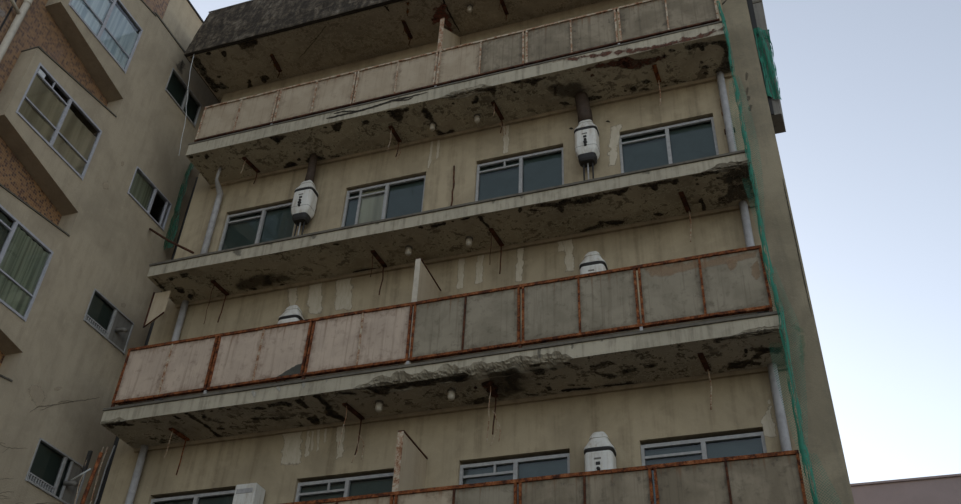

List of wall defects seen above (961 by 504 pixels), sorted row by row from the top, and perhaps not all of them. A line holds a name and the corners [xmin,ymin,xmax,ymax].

rust [554,27,725,77]
peeling [662,40,733,87]
spalling [384,107,409,121]
spalling [422,108,454,135]
spalling [713,325,783,370]
spalling [340,351,573,404]
spalling [173,410,225,437]
spalling [241,394,347,429]